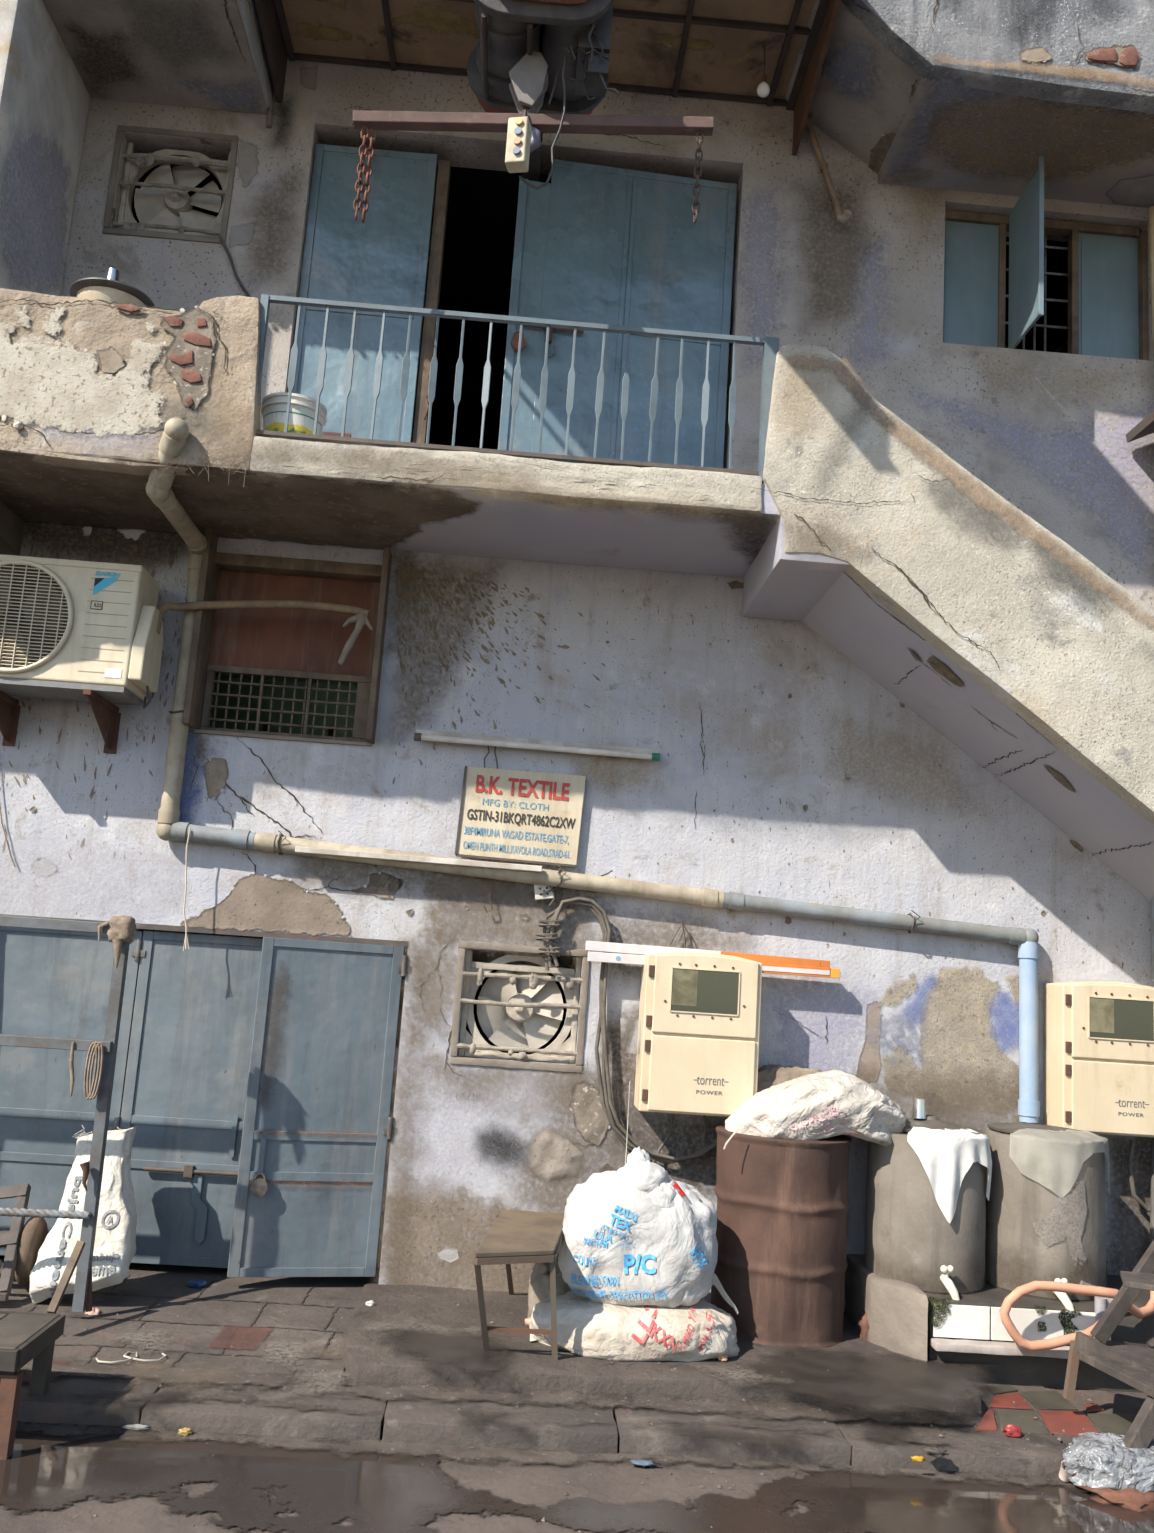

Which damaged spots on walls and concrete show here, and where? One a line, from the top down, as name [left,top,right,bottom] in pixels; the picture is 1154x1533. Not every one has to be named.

peeling [0,302,216,437]
damp [0,449,606,783]
crack [753,475,1056,777]
crack [190,738,322,873]
peeling [180,872,352,936]
peeling [352,872,403,899]
peeling [856,1001,882,1083]